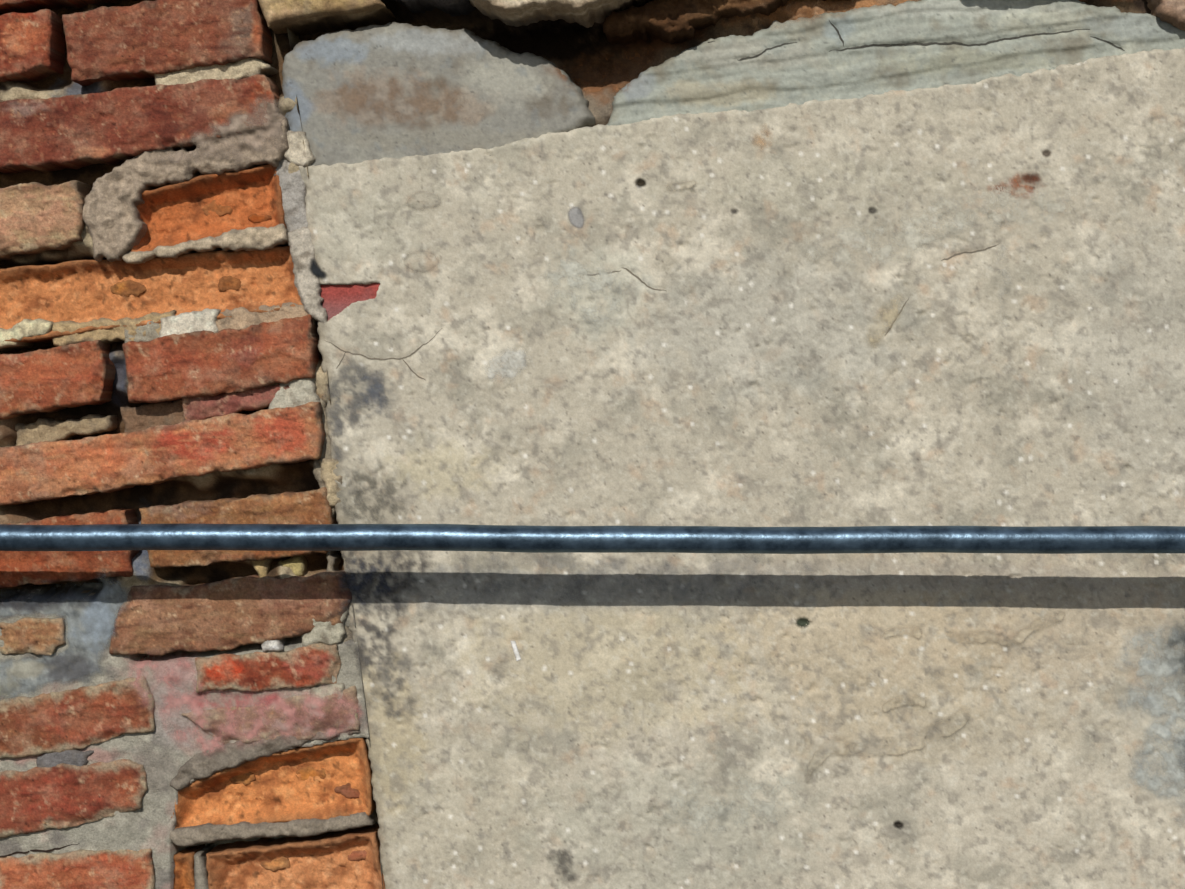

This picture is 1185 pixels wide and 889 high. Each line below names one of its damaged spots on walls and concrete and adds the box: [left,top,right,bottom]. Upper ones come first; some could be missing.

crack [739,42,797,61]
crack [829,20,1125,51]
spalling [0,164,303,344]
flaking render [310,259,380,324]
spalling [171,737,385,889]
crack [0,843,80,858]